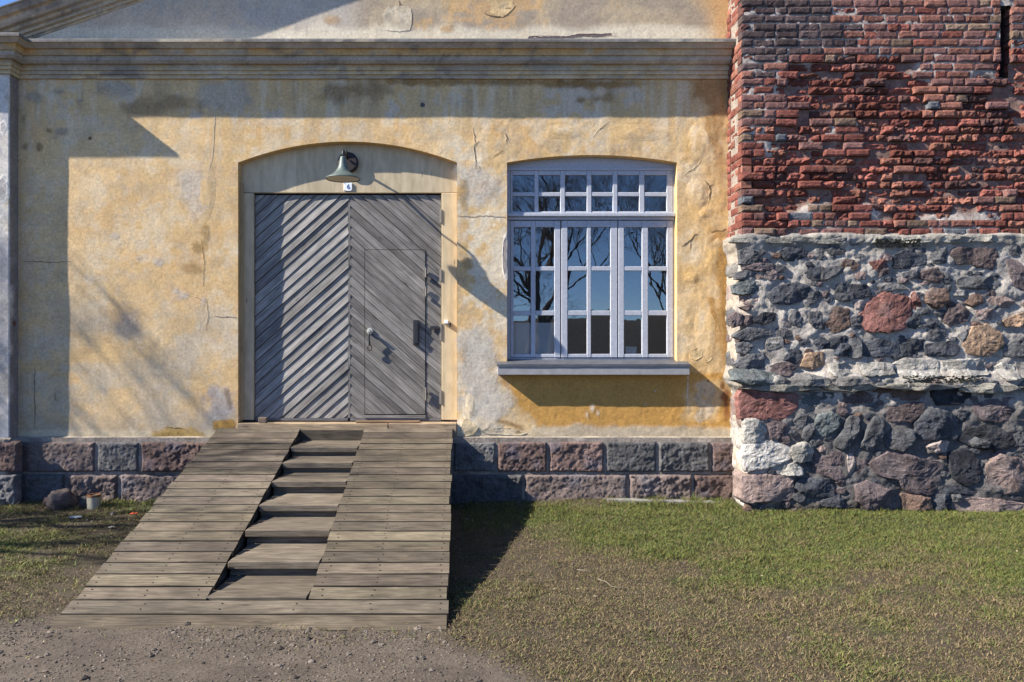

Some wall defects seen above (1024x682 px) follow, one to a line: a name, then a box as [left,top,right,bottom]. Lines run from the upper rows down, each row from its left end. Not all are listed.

flaking render [383,5,412,32]
flaking render [487,0,515,17]
crack [473,130,508,170]
crack [684,160,714,205]